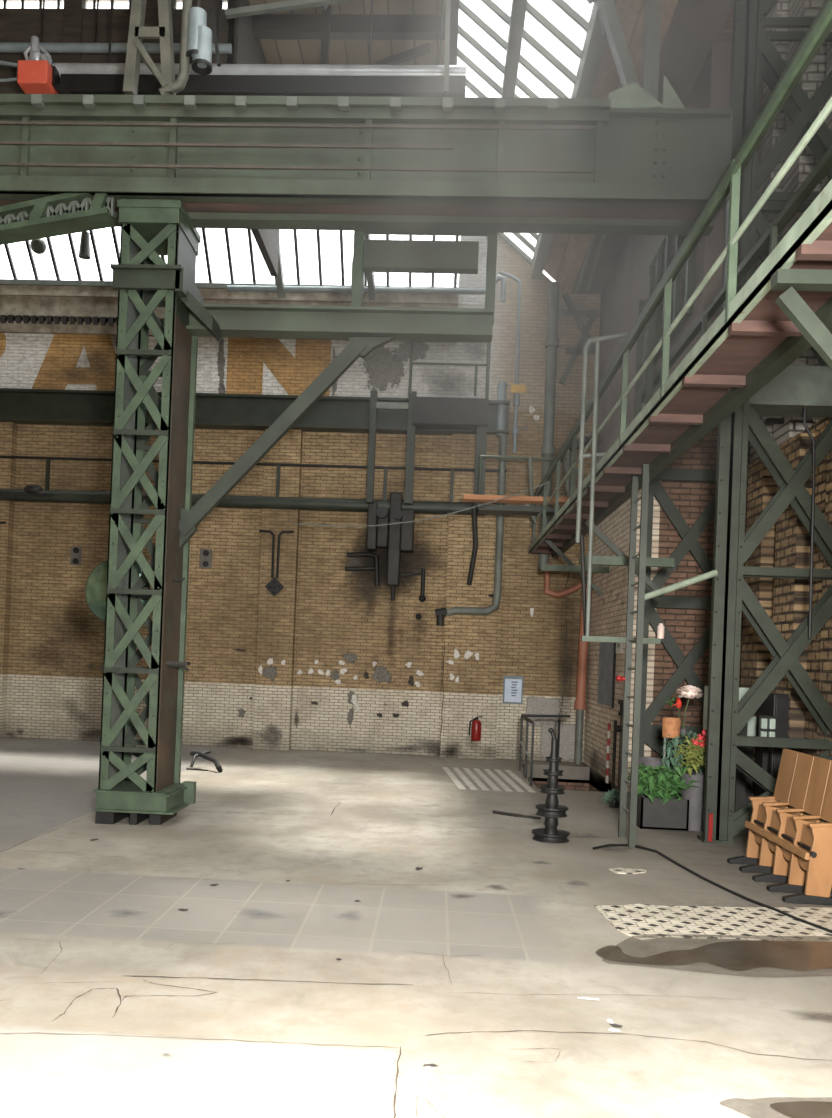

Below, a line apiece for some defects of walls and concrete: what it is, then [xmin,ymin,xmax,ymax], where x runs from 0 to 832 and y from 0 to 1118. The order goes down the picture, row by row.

spalling [258,658,286,681]
spalling [296,653,392,685]
spalling [405,662,424,687]
spalling [447,649,479,682]
crack [0,939,820,1118]